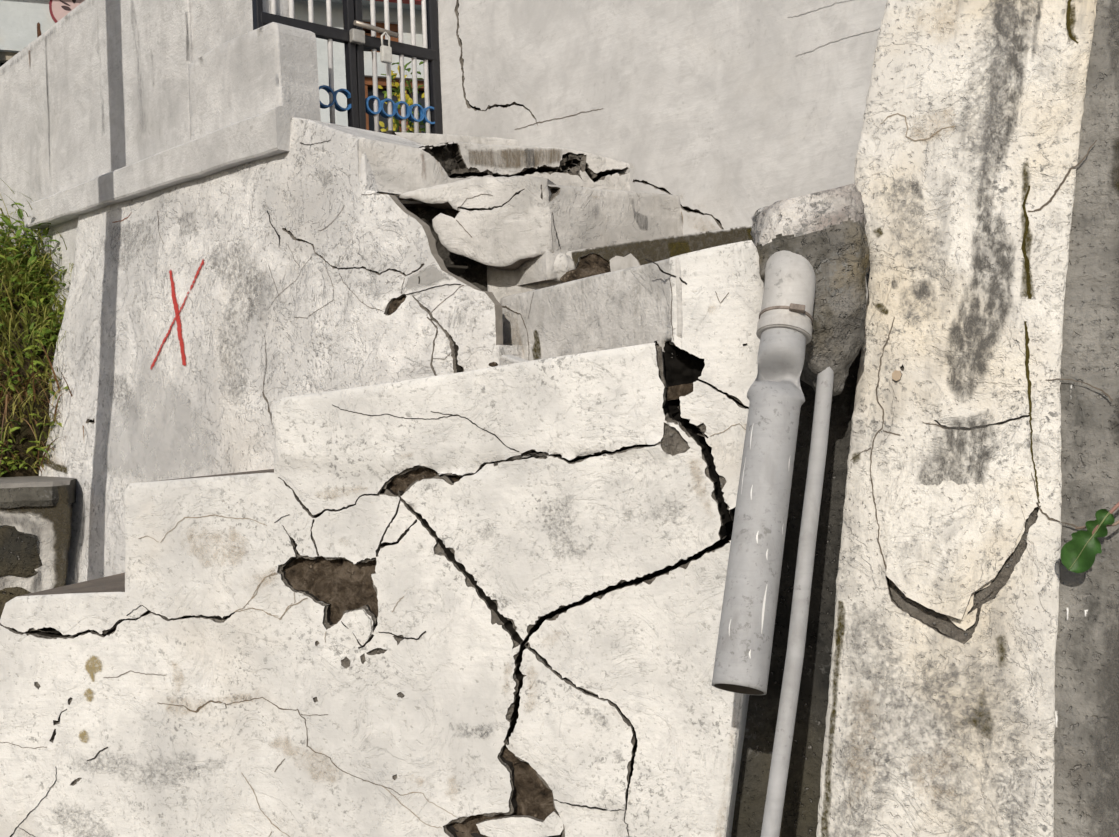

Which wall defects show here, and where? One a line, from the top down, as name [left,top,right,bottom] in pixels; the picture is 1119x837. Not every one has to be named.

crack [456,1,603,130]
flaking render [419,142,469,178]
crack [448,154,724,237]
water stain [946,0,1040,395]
crack [267,193,464,376]
flaking render [560,253,641,283]
flaking render [654,340,705,456]
crack [851,317,1032,585]
water stain [920,419,990,485]
flaking render [279,554,404,669]
crack [0,380,749,837]
flaking render [444,735,565,837]